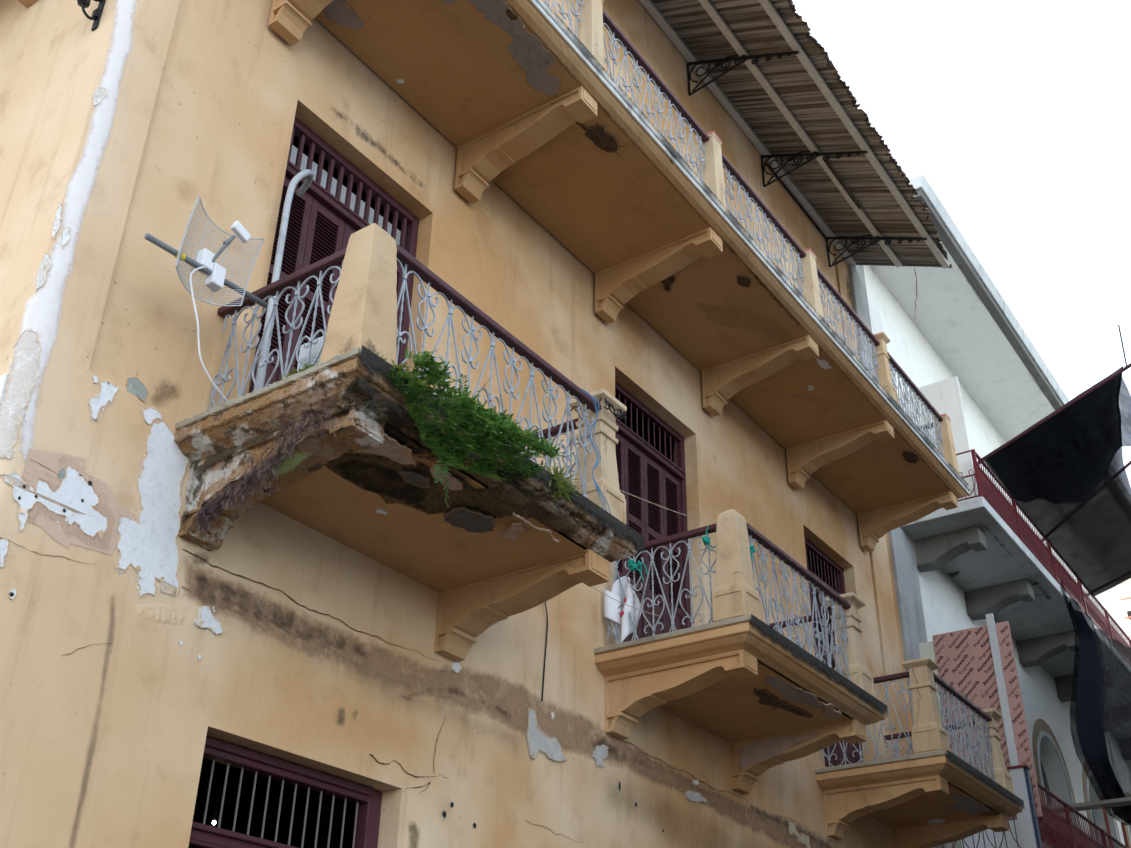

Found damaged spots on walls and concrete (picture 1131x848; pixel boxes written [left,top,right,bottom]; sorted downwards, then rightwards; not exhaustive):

spalling [440,0,561,96]
spalling [576,123,618,153]
flaking render [0,0,189,597]
peeling [357,433,463,490]
crack [183,549,437,661]
spalling [753,676,842,720]
leakage [751,614,888,717]
crack [370,728,447,793]
peeling [525,708,566,765]
peeling [592,745,609,767]